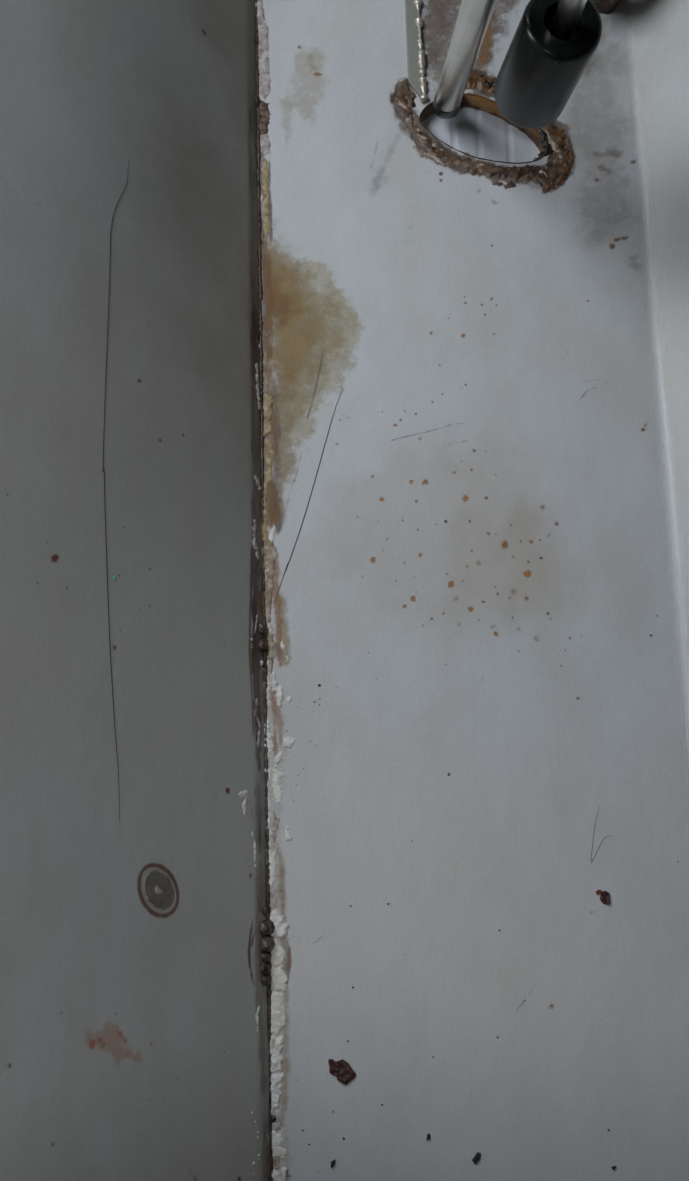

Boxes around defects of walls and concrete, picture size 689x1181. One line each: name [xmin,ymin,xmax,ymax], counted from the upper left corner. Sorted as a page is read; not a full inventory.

rust [422,0,462,81]
rust [466,0,516,118]
rust [390,79,575,193]